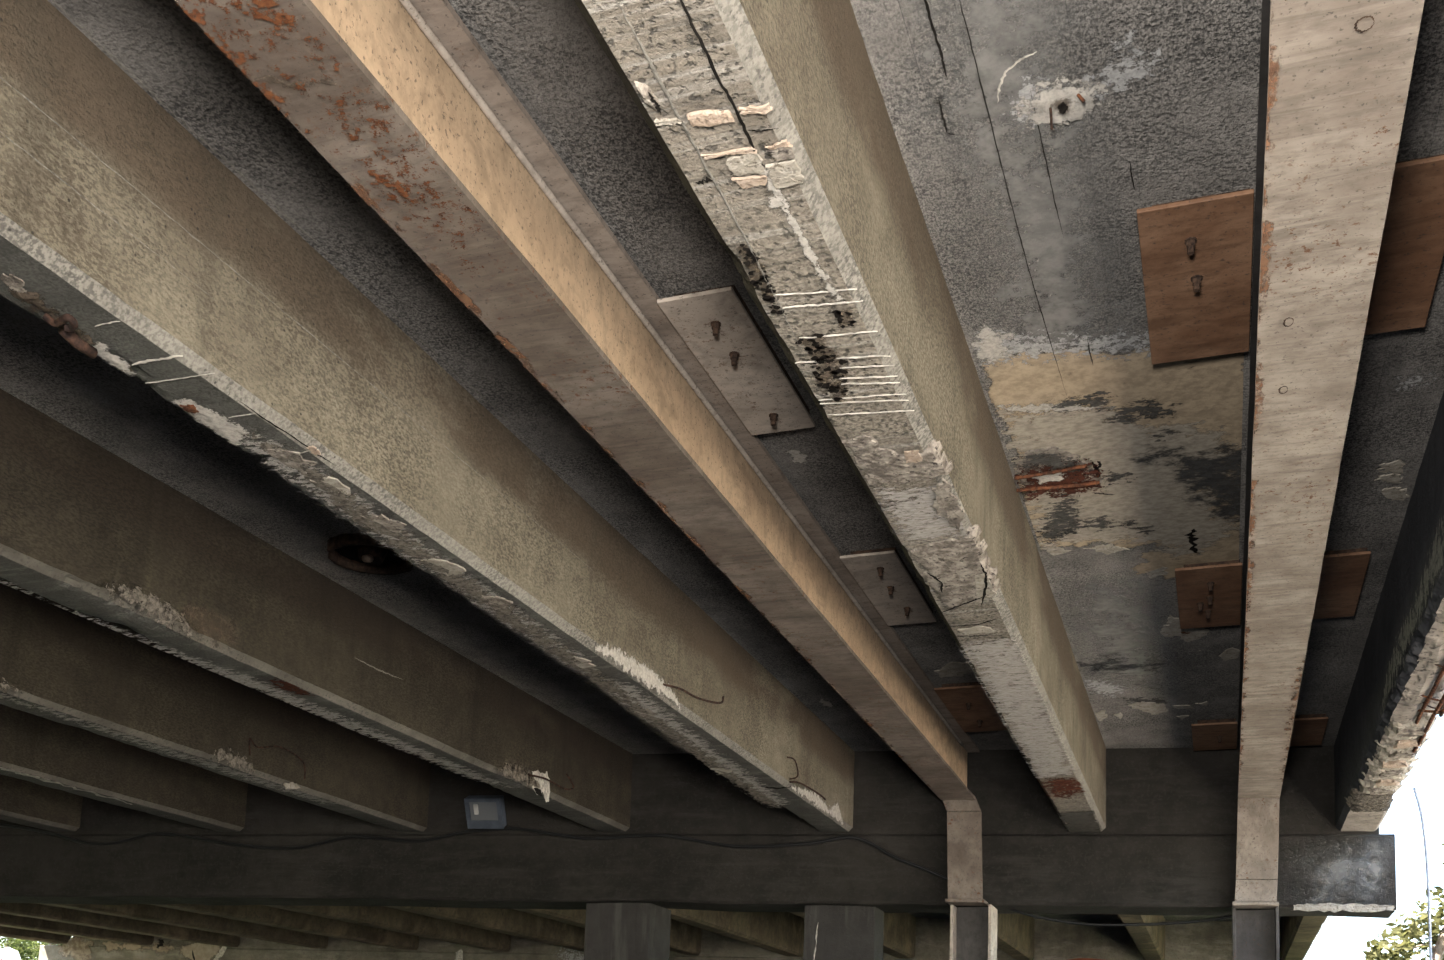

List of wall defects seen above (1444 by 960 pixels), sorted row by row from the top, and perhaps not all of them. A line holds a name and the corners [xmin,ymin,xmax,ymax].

rust [177,0,490,318]
spalling [634,80,772,127]
crack [680,0,779,177]
crack [924,0,1093,396]
spalling [997,30,1168,130]
rust [494,332,562,400]
water stain [819,355,914,415]
water stain [0,581,513,788]
spalling [171,398,786,809]
water stain [238,434,787,807]
rust [1039,777,1084,799]
spalling [1344,515,1444,813]